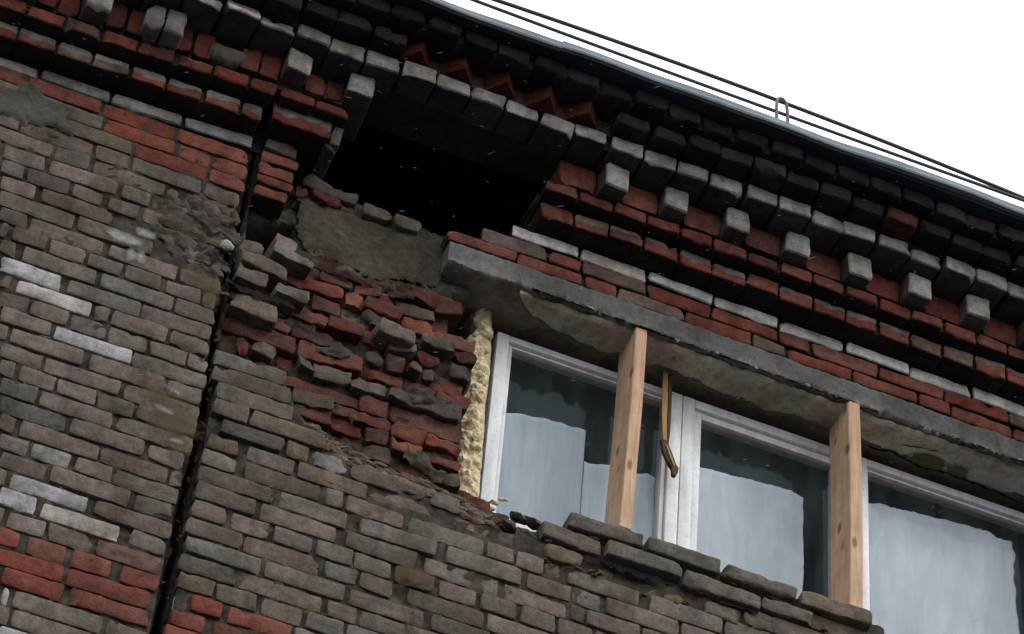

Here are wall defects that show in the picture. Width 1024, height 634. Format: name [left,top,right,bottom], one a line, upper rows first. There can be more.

crack [149,121,295,634]
spalling [148,102,541,539]